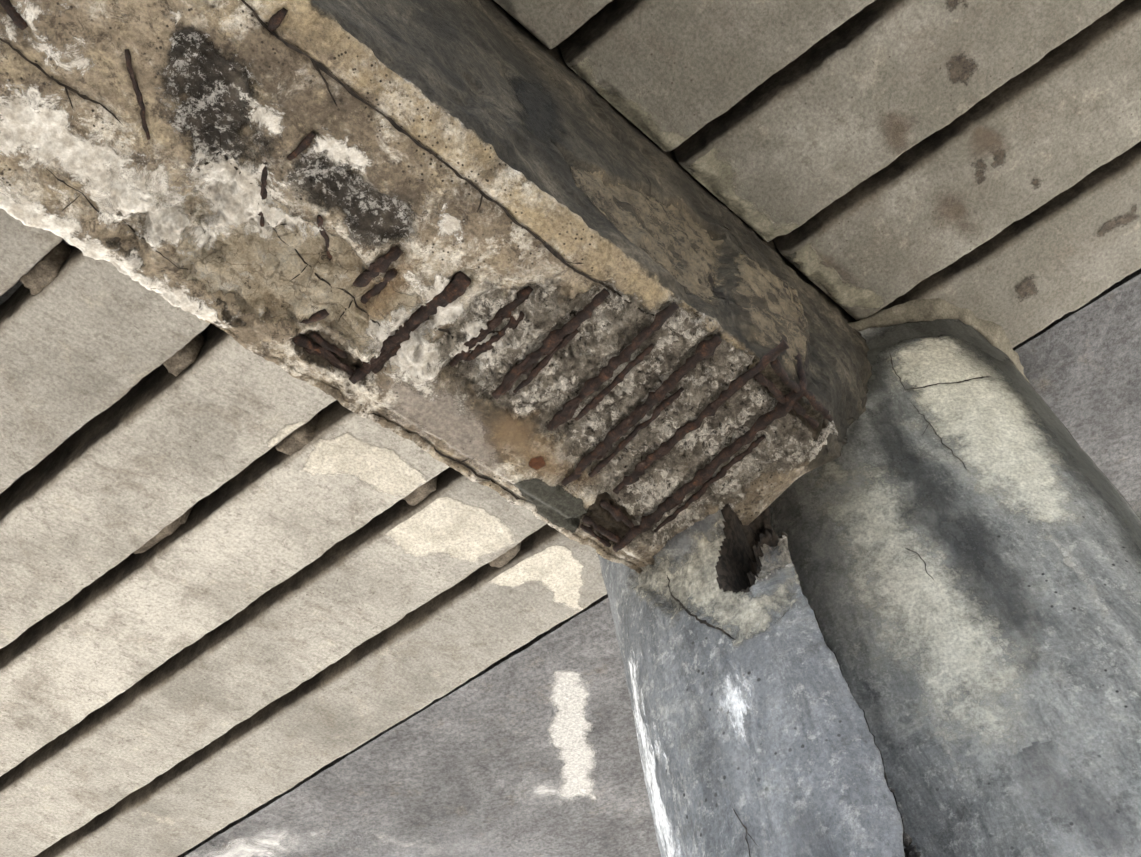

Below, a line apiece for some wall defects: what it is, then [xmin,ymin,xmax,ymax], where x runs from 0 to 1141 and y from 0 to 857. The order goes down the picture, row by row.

damp [0,1,95,75]
crack [0,38,122,124]
spalling [106,237,146,269]
spalling [125,49,150,140]
damp [0,84,323,328]
crack [189,131,388,334]
damp [313,128,372,174]
crack [241,0,684,339]
damp [357,271,508,475]
rust [529,456,546,470]
spalling [157,23,1034,745]
crack [890,355,990,470]